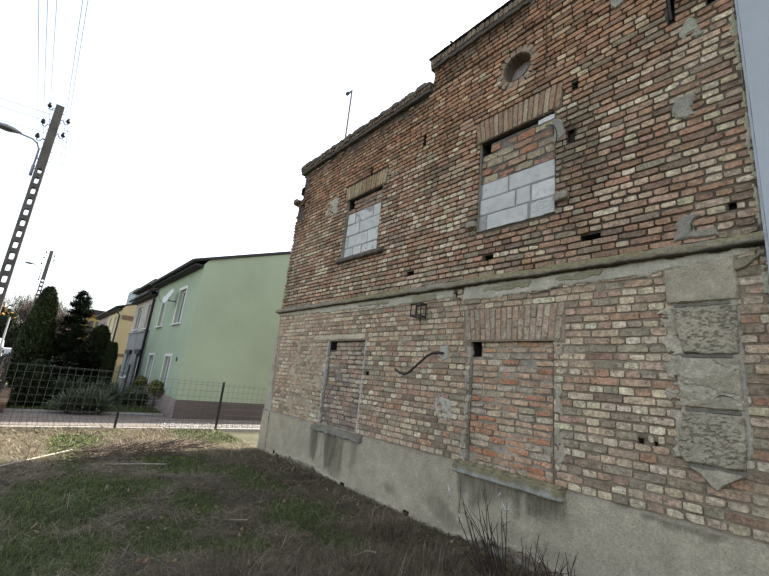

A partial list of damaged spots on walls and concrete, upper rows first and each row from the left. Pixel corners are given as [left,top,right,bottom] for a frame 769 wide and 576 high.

flaking render [279,246,762,316]